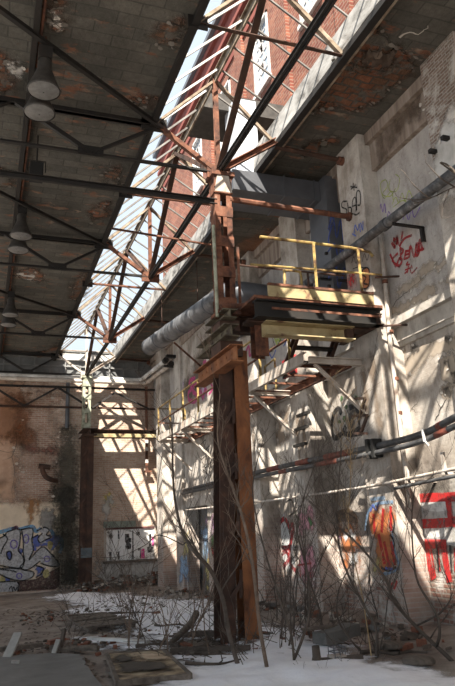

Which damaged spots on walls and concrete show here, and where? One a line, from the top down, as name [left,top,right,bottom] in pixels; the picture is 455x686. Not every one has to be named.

spalling [42,0,68,32]
spalling [16,268,46,284]
damp [49,425,80,589]